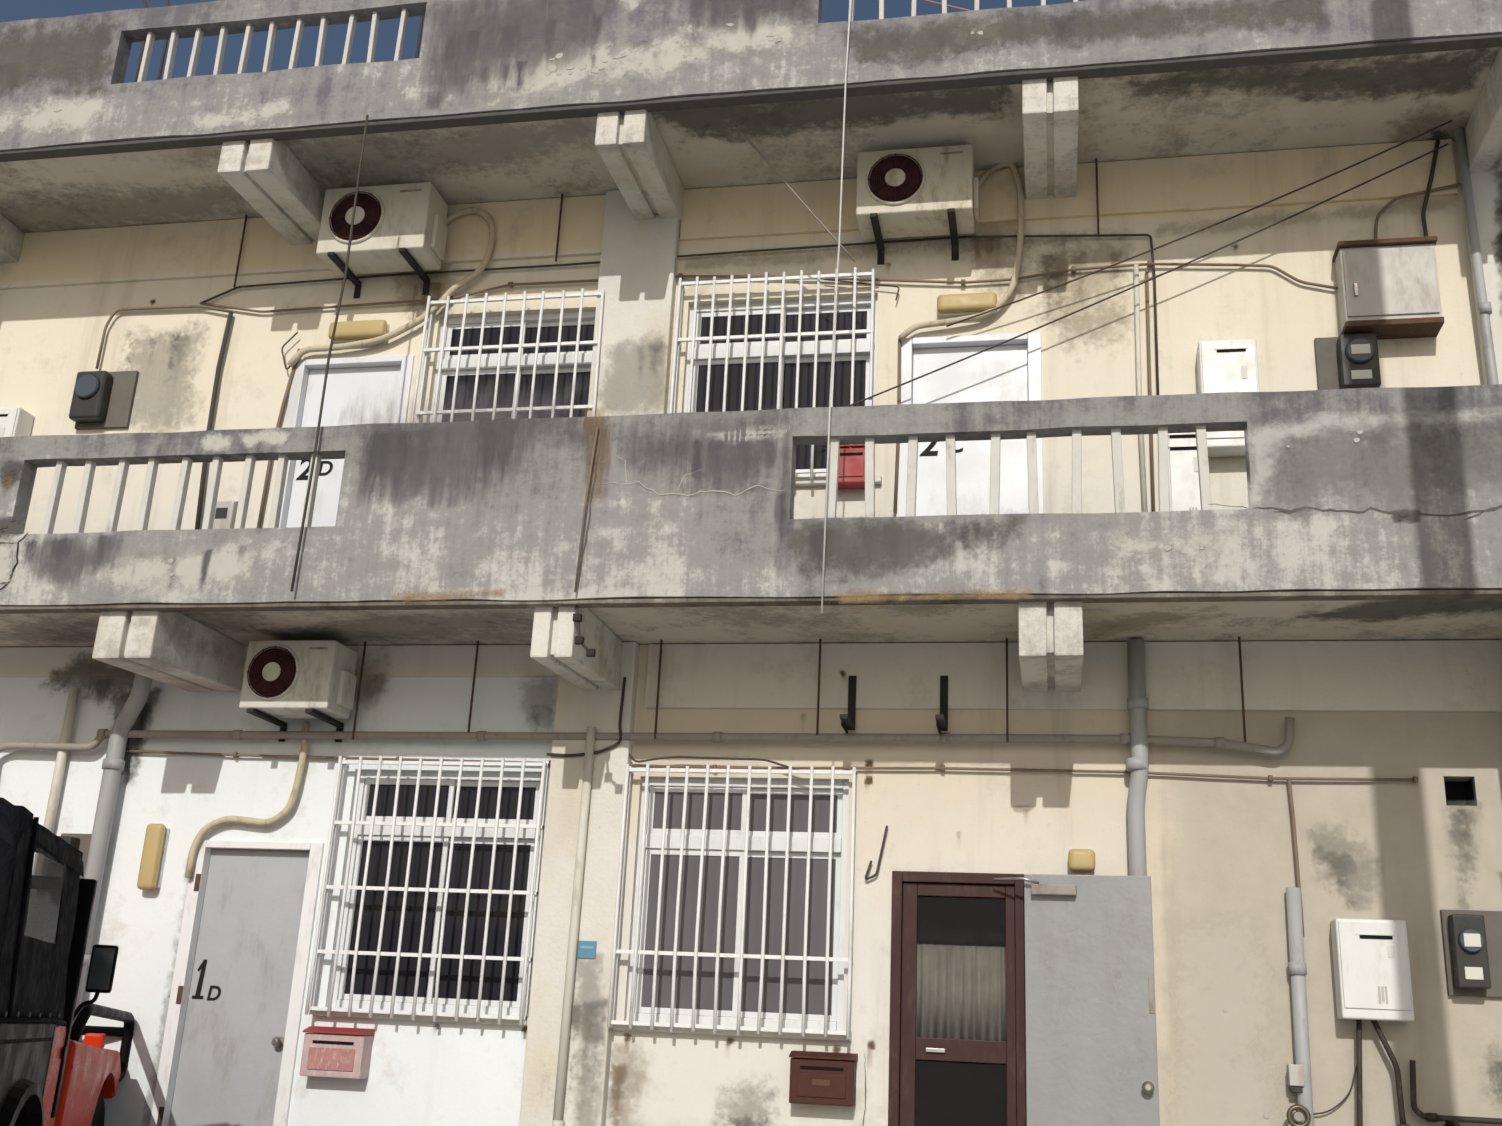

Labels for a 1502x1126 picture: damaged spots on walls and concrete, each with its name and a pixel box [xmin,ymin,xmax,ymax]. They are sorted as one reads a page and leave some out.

leakage [0,22,111,93]
crack [1208,504,1502,520]
crack [0,533,28,590]
leakage [48,658,160,781]